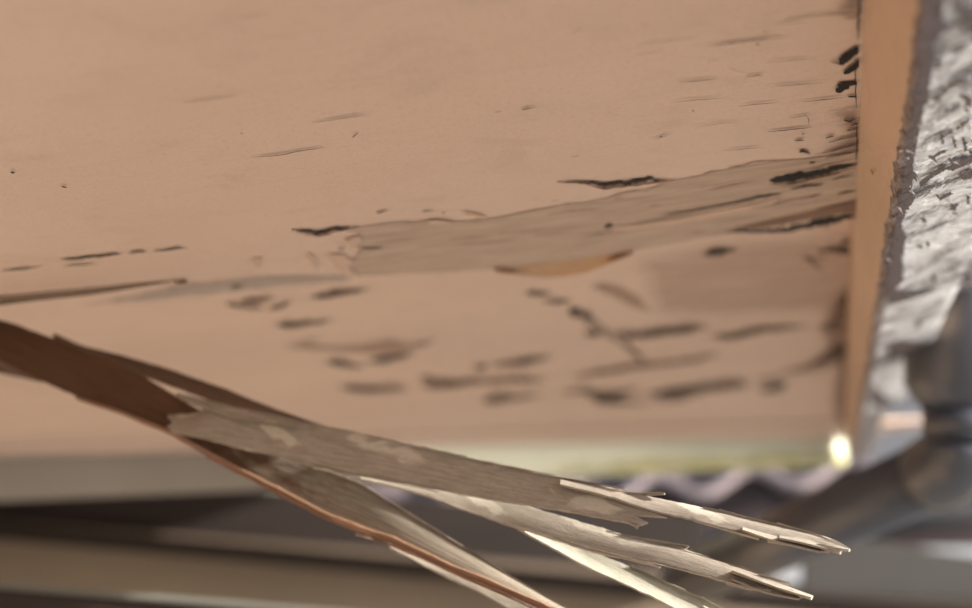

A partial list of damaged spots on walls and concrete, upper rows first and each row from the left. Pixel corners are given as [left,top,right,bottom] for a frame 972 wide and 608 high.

peeling [347,151,859,276]
peeling [884,0,972,304]
crack [327,291,847,405]
peeling [887,340,935,361]